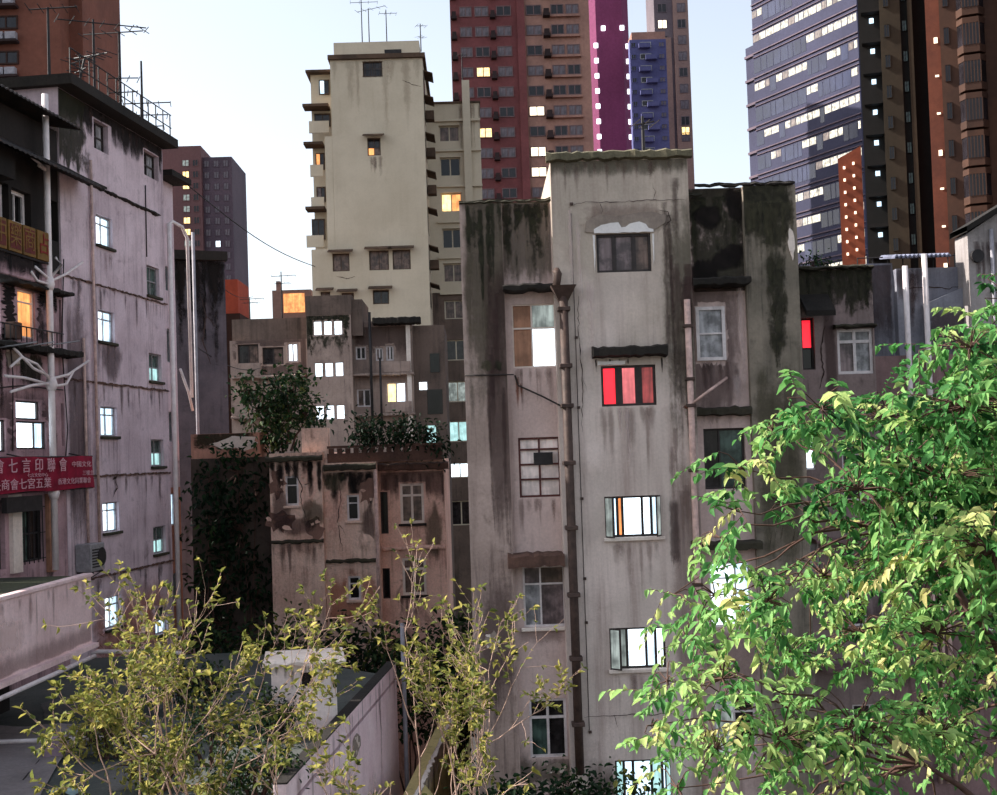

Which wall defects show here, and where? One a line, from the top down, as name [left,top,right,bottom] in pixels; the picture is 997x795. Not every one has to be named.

water stain [0,248,46,279]
peeling [585,212,666,268]
water stain [661,183,793,423]
water stain [799,265,919,325]
water stain [0,283,57,447]
water stain [465,202,552,510]
crack [818,327,826,387]
water stain [824,316,836,396]
peeling [265,464,346,540]
water stain [269,461,444,558]